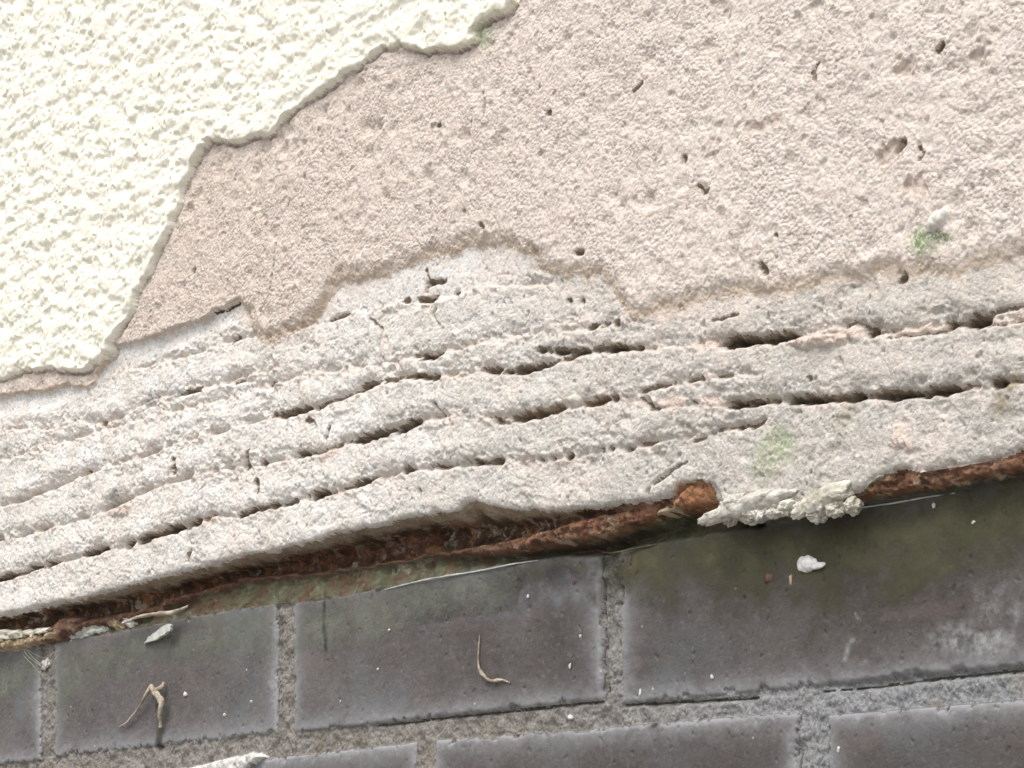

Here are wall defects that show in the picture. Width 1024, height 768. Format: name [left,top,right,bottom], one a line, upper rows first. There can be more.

peeling [380,0,520,55]
spalling [893,51,918,79]
spalling [967,35,993,68]
spalling [742,111,784,136]
spalling [870,136,907,170]
spalling [901,168,932,199]
flaking render [0,246,1024,618]
rust [674,484,718,513]
water stain [610,476,1024,599]